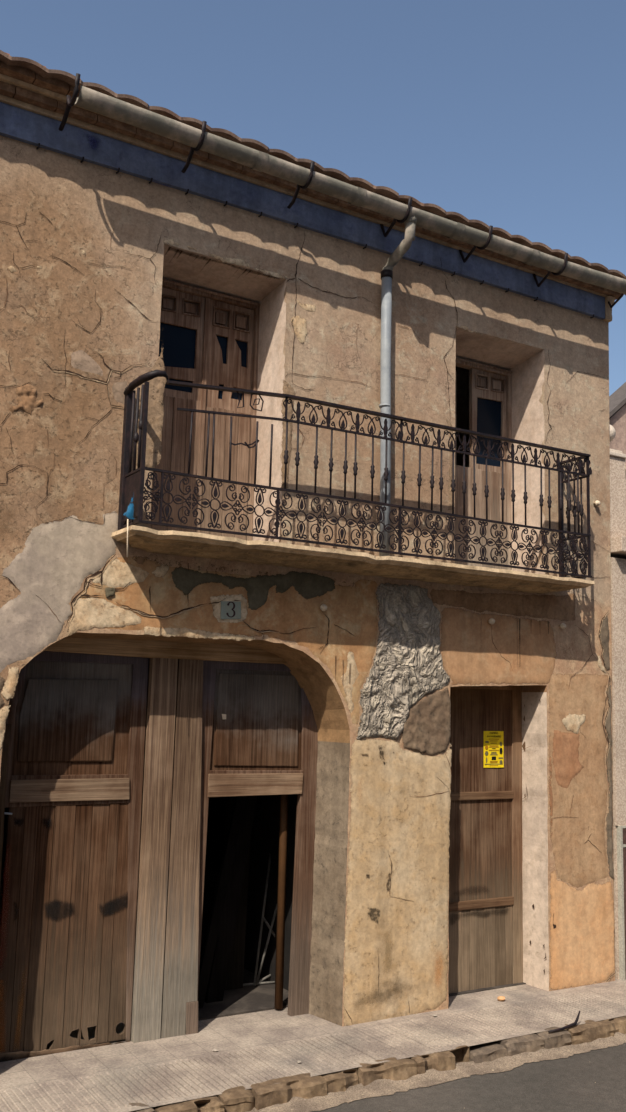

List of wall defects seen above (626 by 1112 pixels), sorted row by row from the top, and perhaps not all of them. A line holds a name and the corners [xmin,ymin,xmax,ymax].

crack [0,212,161,524]
crack [285,232,371,390]
crack [396,280,458,407]
peeling [67,556,256,641]
crack [0,554,353,653]
spalling [596,616,610,673]
flaking render [0,667,19,754]
peeling [549,714,586,836]